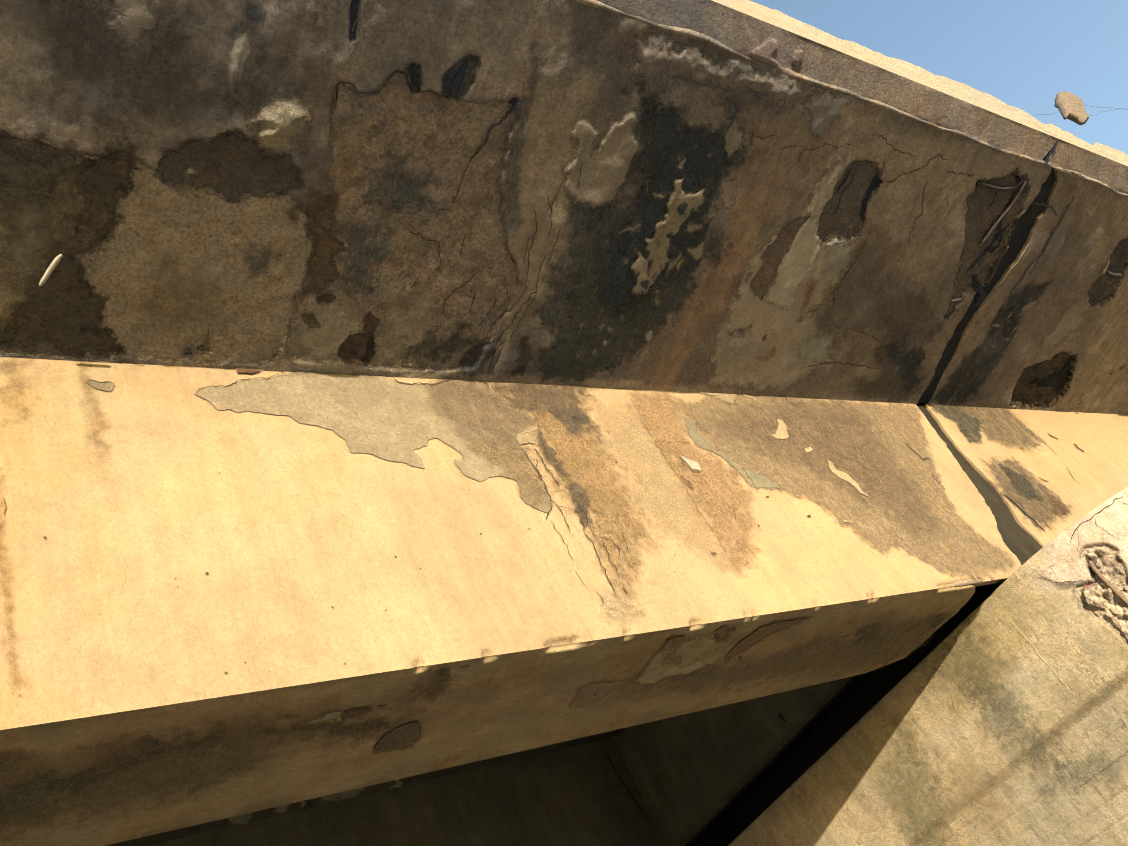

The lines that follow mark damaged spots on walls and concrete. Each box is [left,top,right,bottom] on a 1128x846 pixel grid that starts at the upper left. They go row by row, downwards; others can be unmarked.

crack [438,94,526,211]
crack [631,27,975,245]
spalling [0,54,552,513]
crack [405,186,561,374]
damp [458,75,754,596]
spalling [750,160,885,299]
spalling [943,171,1029,319]
spalling [1009,352,1077,409]
spalling [1087,238,1128,307]
crack [1002,493,1128,550]
spalling [1048,544,1128,645]
damp [0,665,469,840]